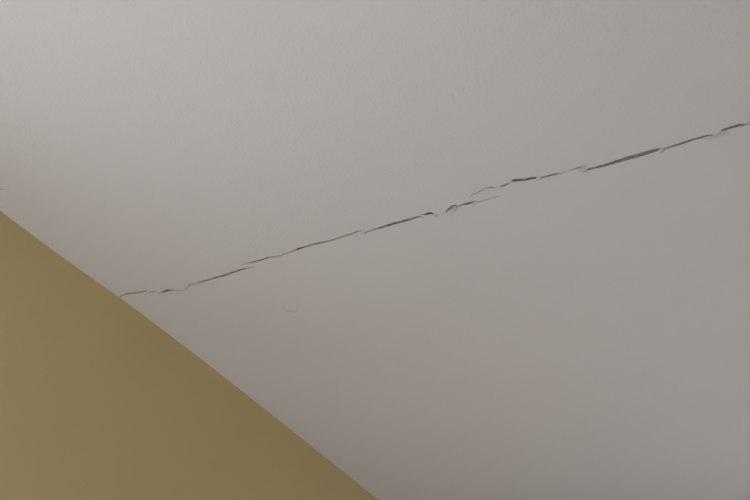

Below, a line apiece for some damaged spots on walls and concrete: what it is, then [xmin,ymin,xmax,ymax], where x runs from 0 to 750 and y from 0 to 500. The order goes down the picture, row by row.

crack [489,122,750,188]
crack [119,200,474,297]